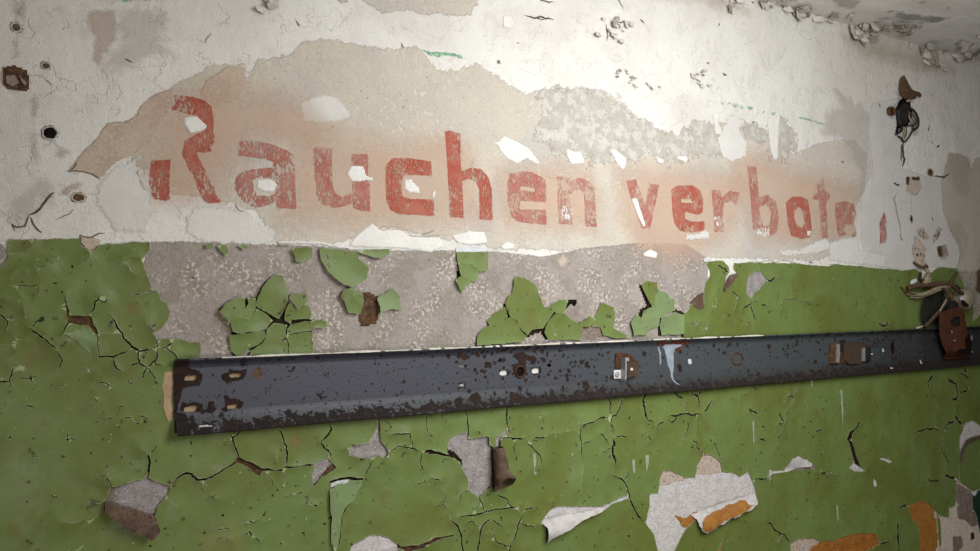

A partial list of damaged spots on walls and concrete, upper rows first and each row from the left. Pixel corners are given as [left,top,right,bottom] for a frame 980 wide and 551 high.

crack [525,0,554,20]
peeling [70,39,867,422]
crack [0,192,104,408]
crack [93,294,157,428]
corrosion [173,360,244,419]
corrosion [221,368,263,383]
corrosion [446,346,614,404]
corrosion [657,339,746,373]
peeling [419,424,516,501]
peeling [539,491,630,543]
crack [506,391,720,521]
peeling [643,450,758,551]